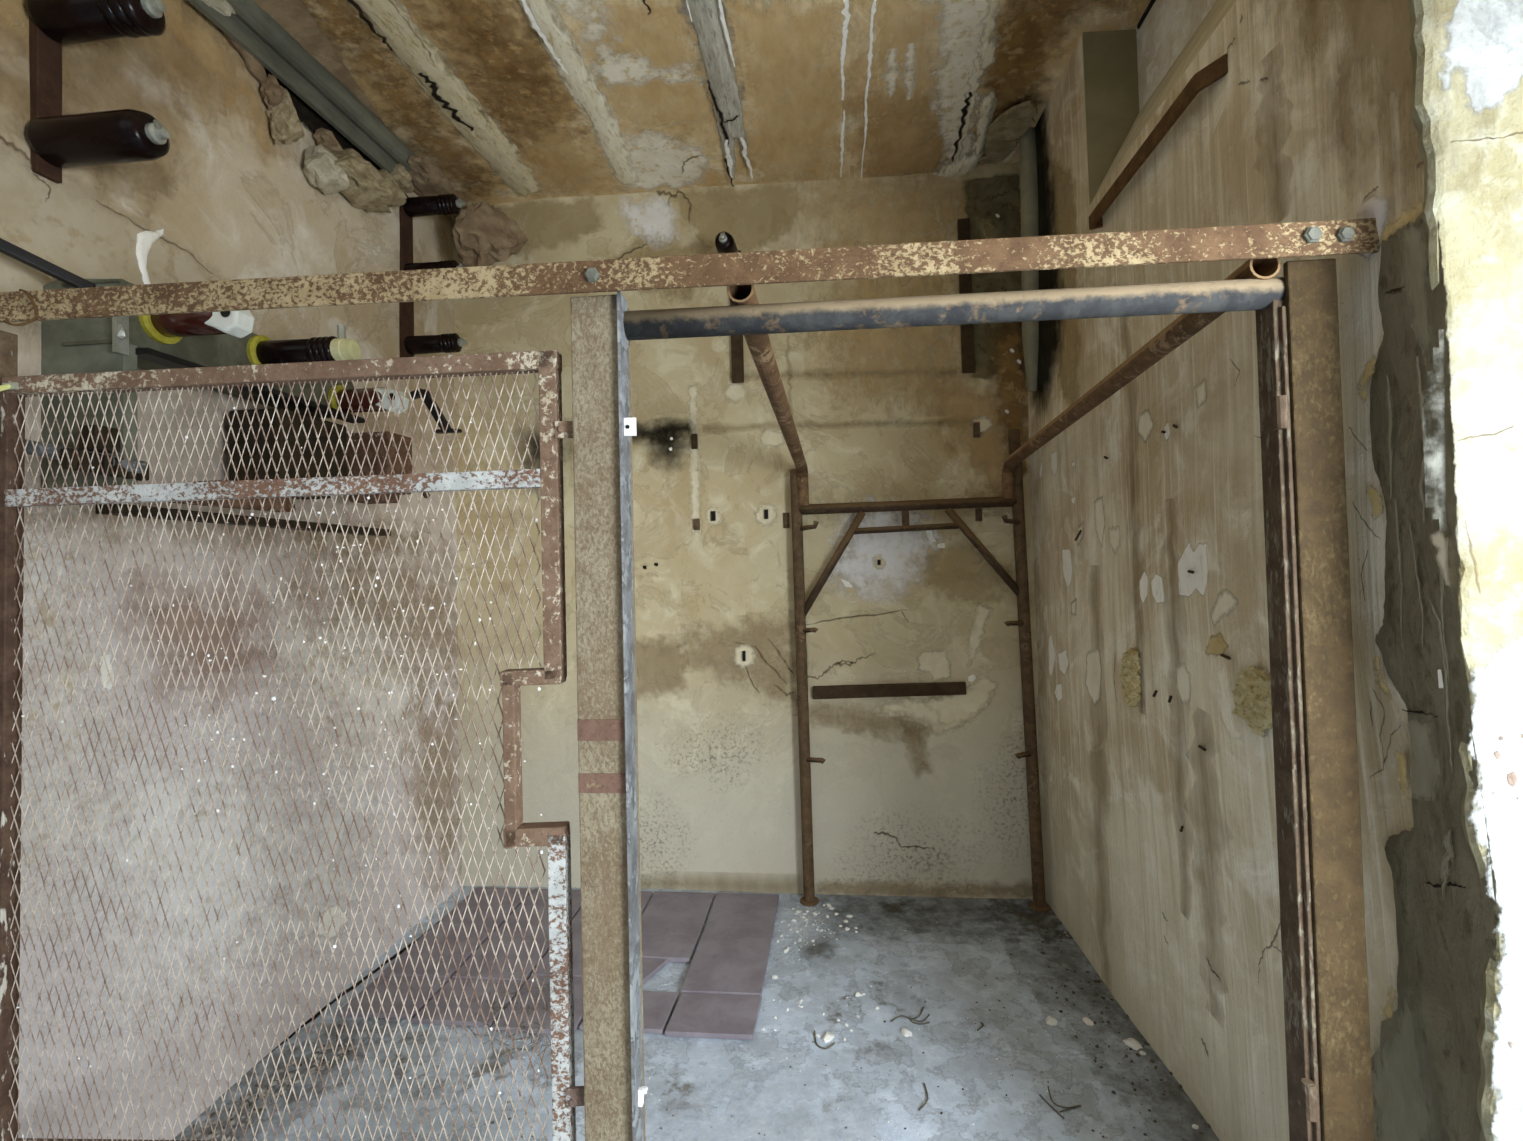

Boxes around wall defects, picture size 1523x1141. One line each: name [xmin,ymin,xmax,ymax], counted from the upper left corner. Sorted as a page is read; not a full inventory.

peeling [1438,0,1523,113]
crack [1417,132,1523,168]
peeling [1380,203,1423,241]
peeling [1062,549,1072,588]
peeling [1431,532,1449,585]
leakage [636,627,796,701]
crack [809,654,873,679]
crack [807,610,908,625]
peeling [1049,635,1069,702]
spalling [1085,648,1141,707]
spalling [1140,542,1272,737]
peeling [1469,636,1523,1141]